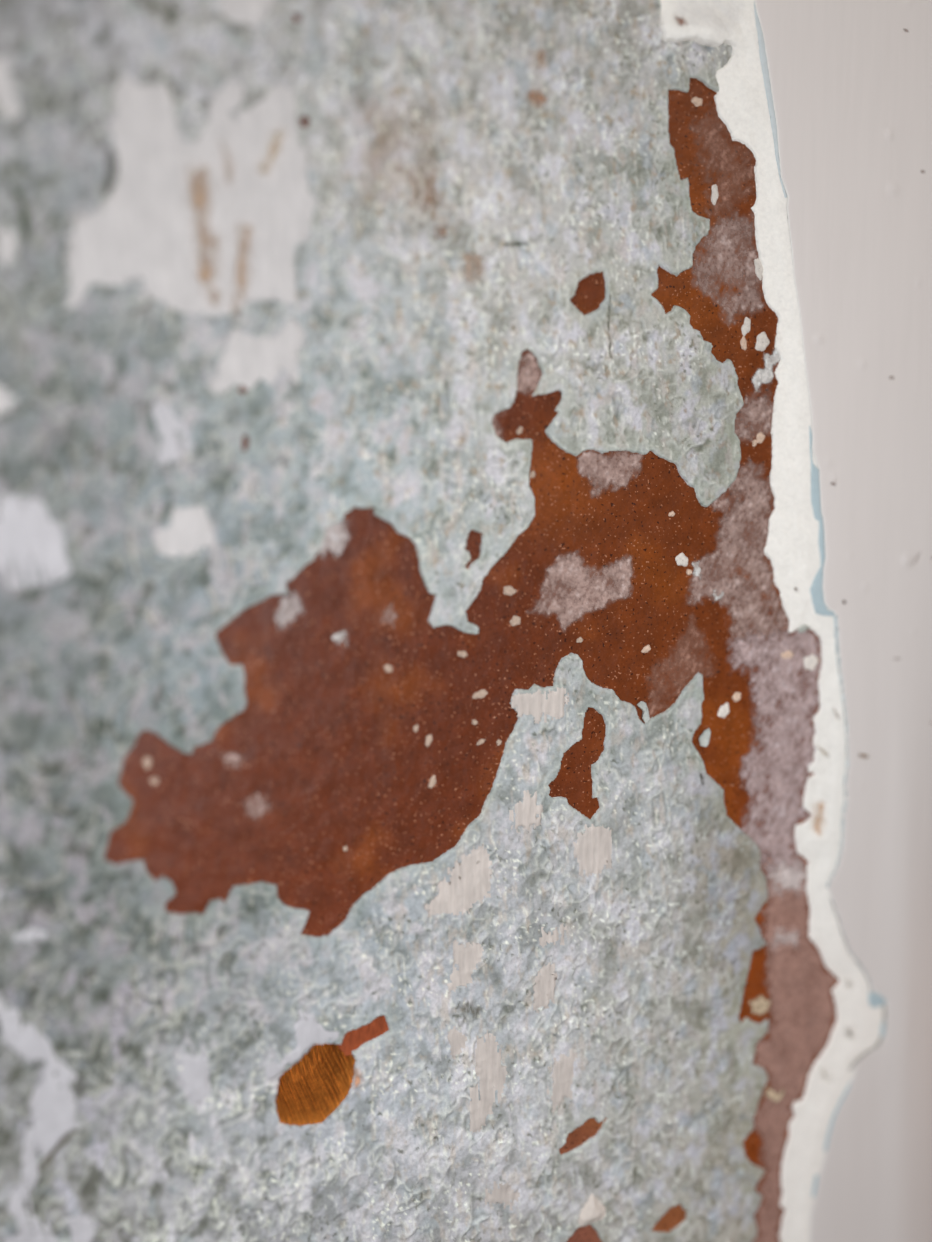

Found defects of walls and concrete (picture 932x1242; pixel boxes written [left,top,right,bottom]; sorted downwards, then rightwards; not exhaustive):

corrosion [190,170,216,303]
peeling [104,78,822,937]
flaking render [660,0,886,1242]
spalling [337,1015,389,1056]
peeling [559,1118,607,1154]
peeling [567,1224,602,1242]
peeling [652,1204,687,1233]